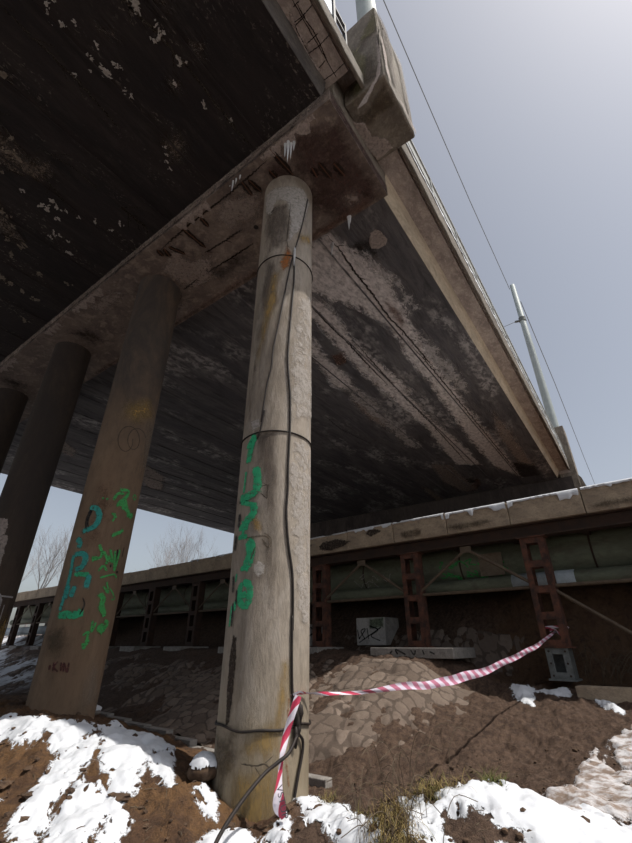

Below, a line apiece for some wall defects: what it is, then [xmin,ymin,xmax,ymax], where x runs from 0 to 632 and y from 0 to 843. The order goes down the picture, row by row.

peeling [86,40,123,79]
crack [293,1,326,68]
corrosion [268,126,378,239]
spalling [369,229,387,249]
crack [313,235,516,470]
water stain [301,232,532,491]